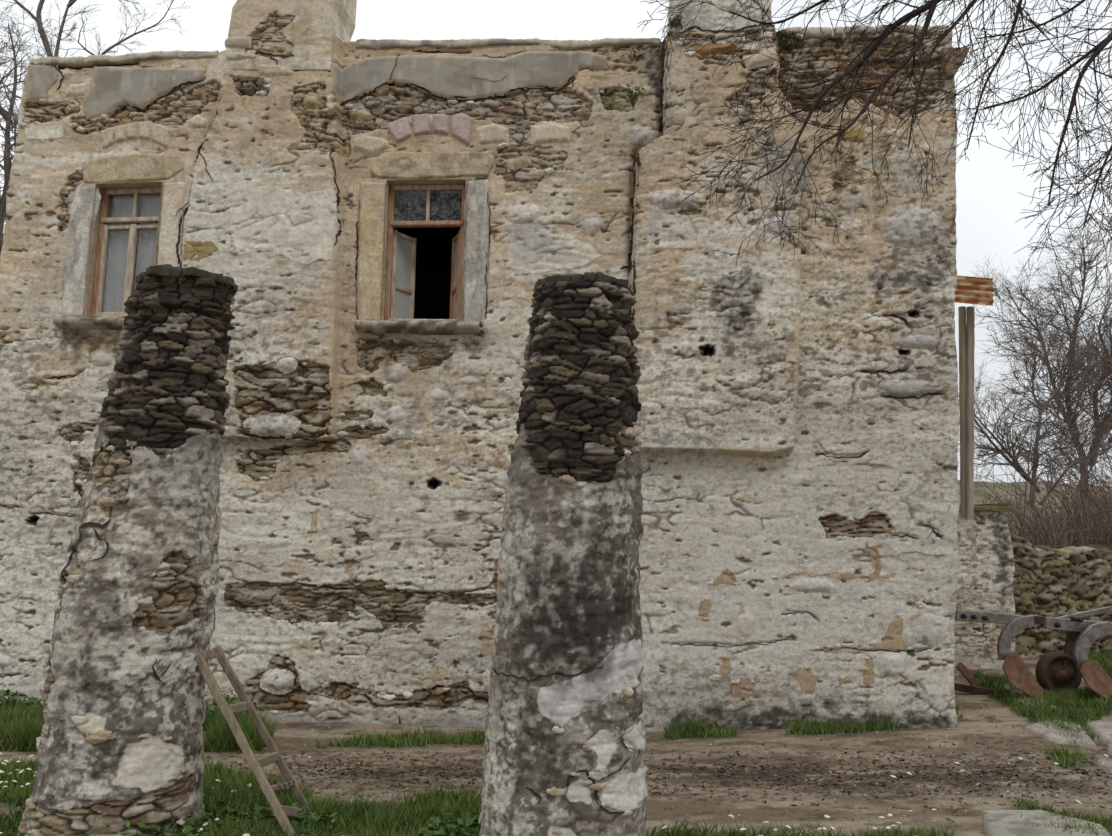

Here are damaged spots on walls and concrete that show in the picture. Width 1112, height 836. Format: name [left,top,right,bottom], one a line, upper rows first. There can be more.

spalling [18,75,272,142]
crack [195,141,212,179]
crack [333,50,574,110]
spalling [291,82,639,193]
spalling [668,24,945,119]
crack [175,202,189,267]
spalling [55,272,389,518]
spalling [348,338,455,397]
spalling [503,229,643,487]
spalling [772,512,895,582]
spalling [224,562,498,630]
crack [492,660,603,682]